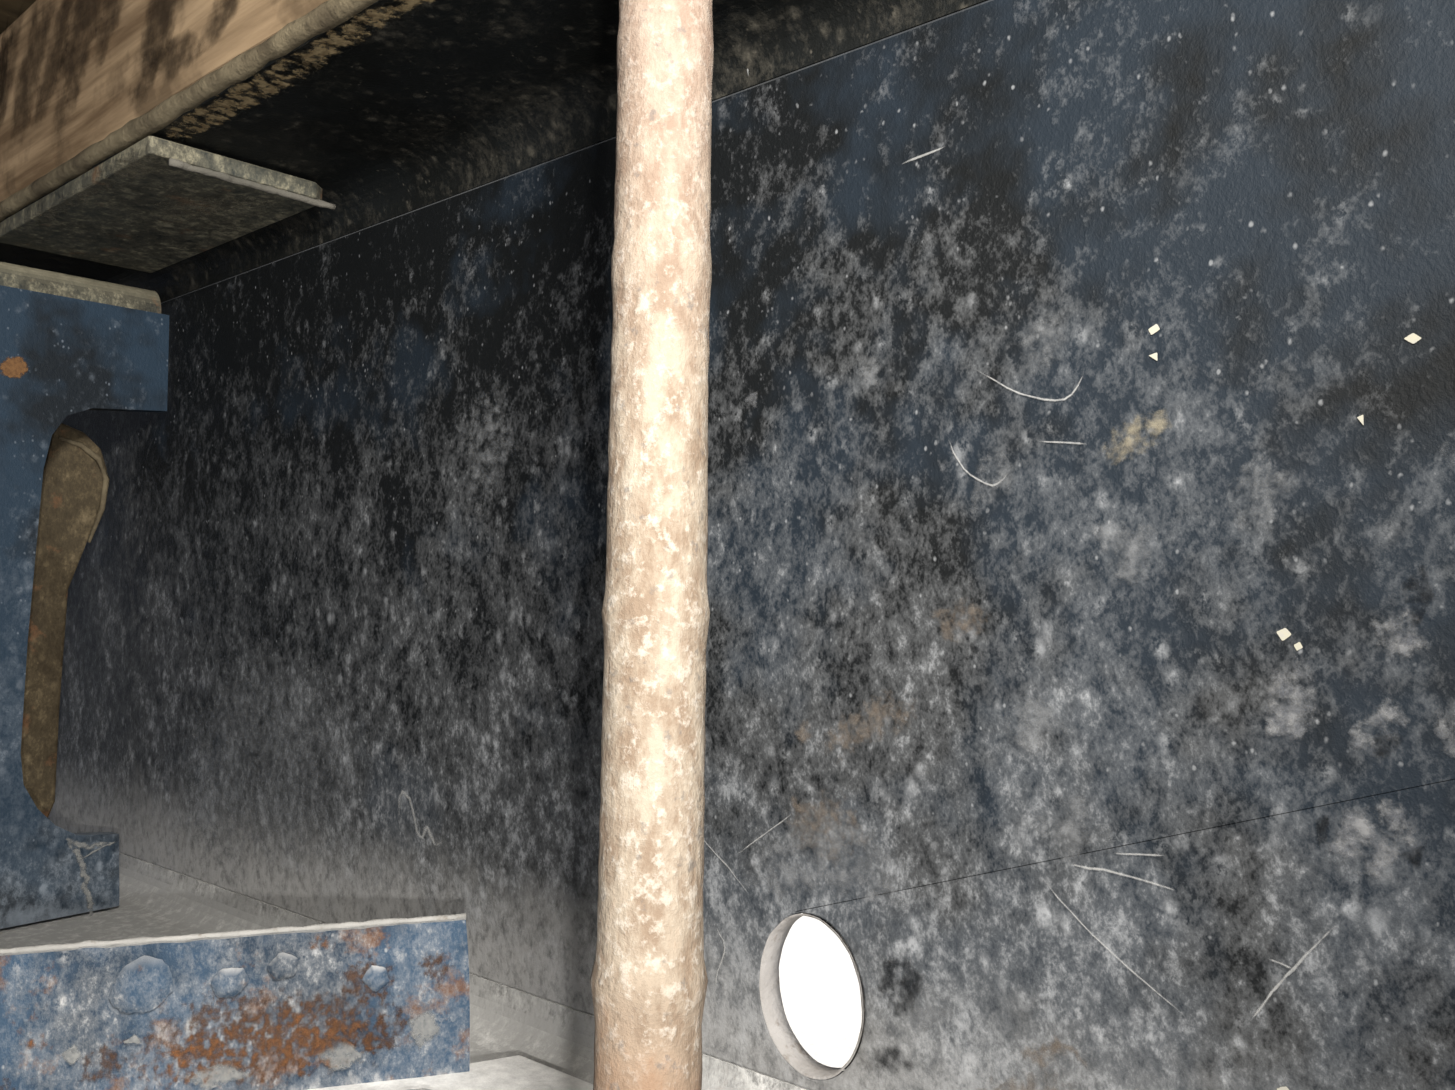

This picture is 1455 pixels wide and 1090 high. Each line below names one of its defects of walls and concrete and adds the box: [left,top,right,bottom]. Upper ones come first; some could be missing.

damp [209,0,236,36]
damp [0,0,117,124]
damp [137,0,191,91]
corrosion [0,357,28,378]
damp [1123,419,1165,447]
corrosion [422,953,448,988]
damp [881,961,920,1011]
corrosion [144,955,407,1083]
corrosion [83,1046,121,1081]
damp [877,1049,909,1066]